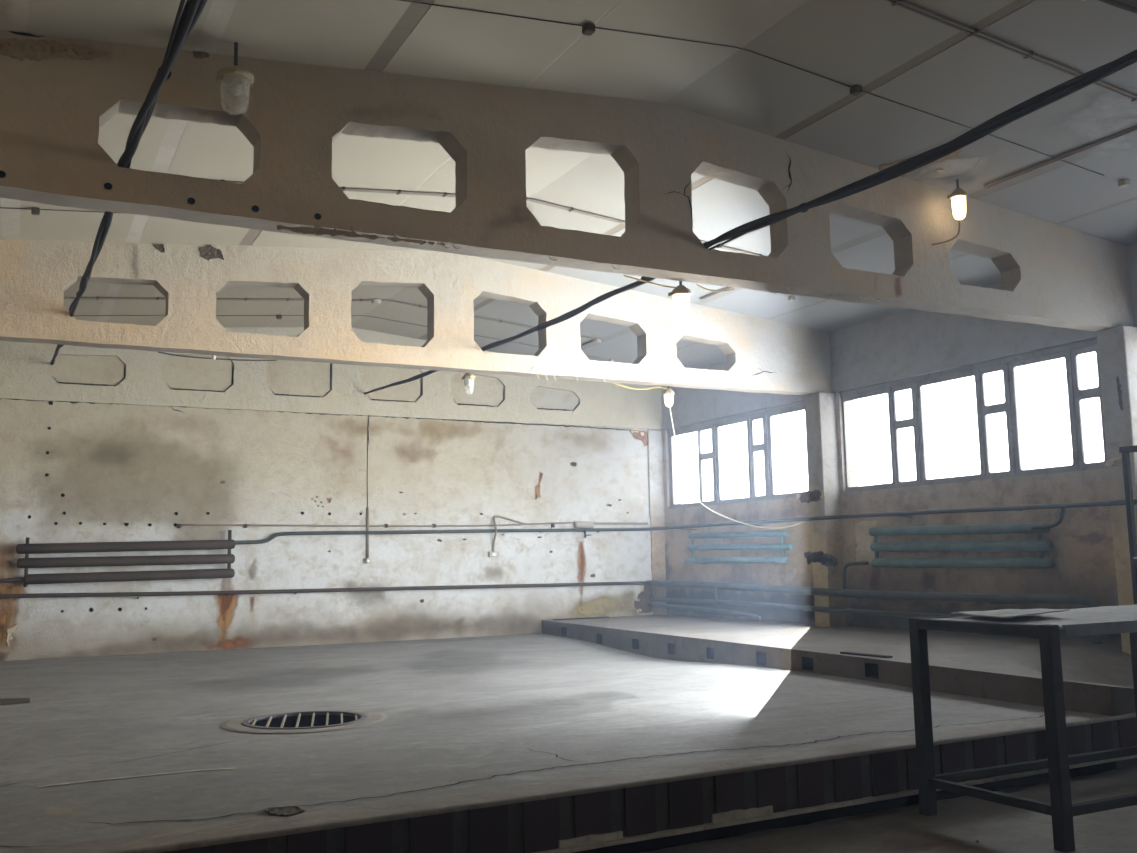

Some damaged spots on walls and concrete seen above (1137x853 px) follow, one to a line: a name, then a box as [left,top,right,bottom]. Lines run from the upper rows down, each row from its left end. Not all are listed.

spalling [0,38,106,62]
crack [664,181,692,217]
crack [783,151,792,192]
rust [577,542,586,604]
rust [0,547,24,660]
rust [209,594,254,650]
crack [300,715,1044,812]
crack [87,810,264,824]